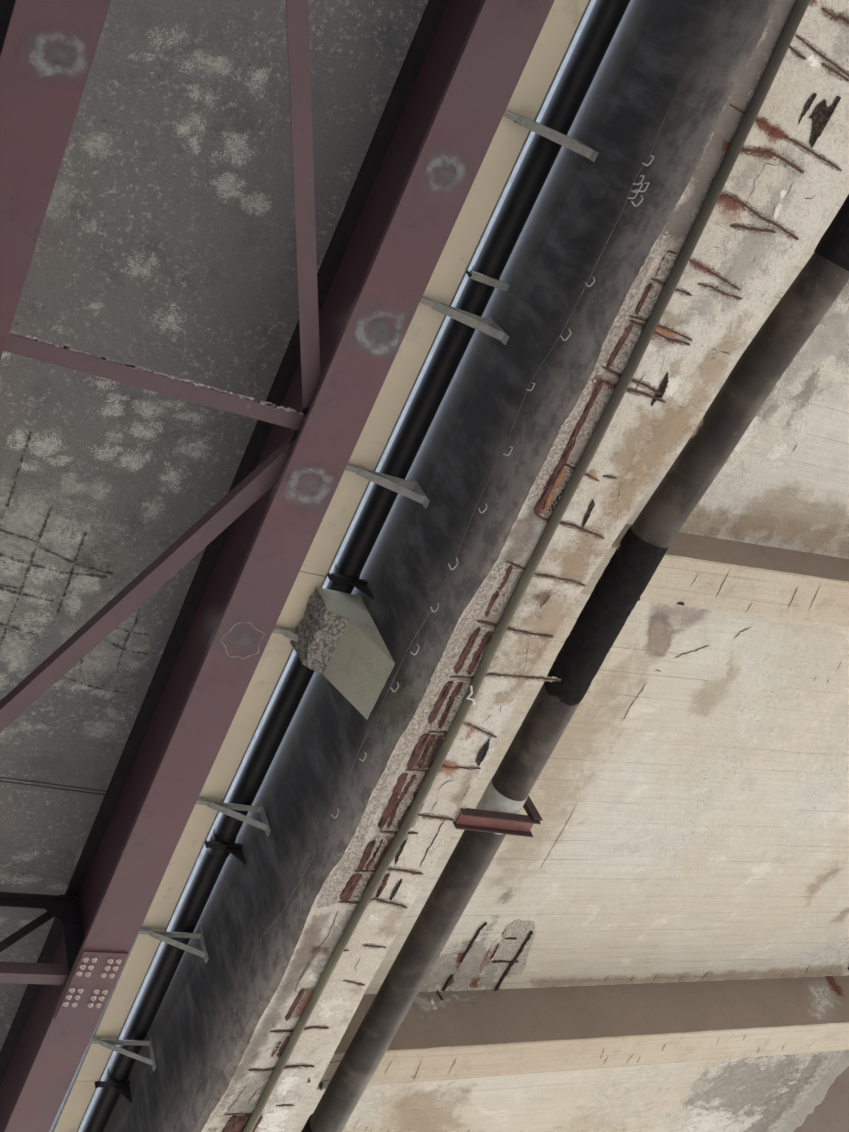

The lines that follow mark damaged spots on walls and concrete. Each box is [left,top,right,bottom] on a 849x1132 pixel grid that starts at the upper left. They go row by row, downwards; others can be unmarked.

water stain [30,35,86,76]
spalling [789,34,849,83]
rust [722,117,785,160]
spalling [724,93,842,174]
rust [717,192,744,214]
spalling [528,231,743,540]
water stain [696,301,849,532]
crack [0,432,113,645]
crack [71,609,148,694]
crack [623,603,752,720]
spalling [314,561,586,909]
spalling [247,988,329,1091]